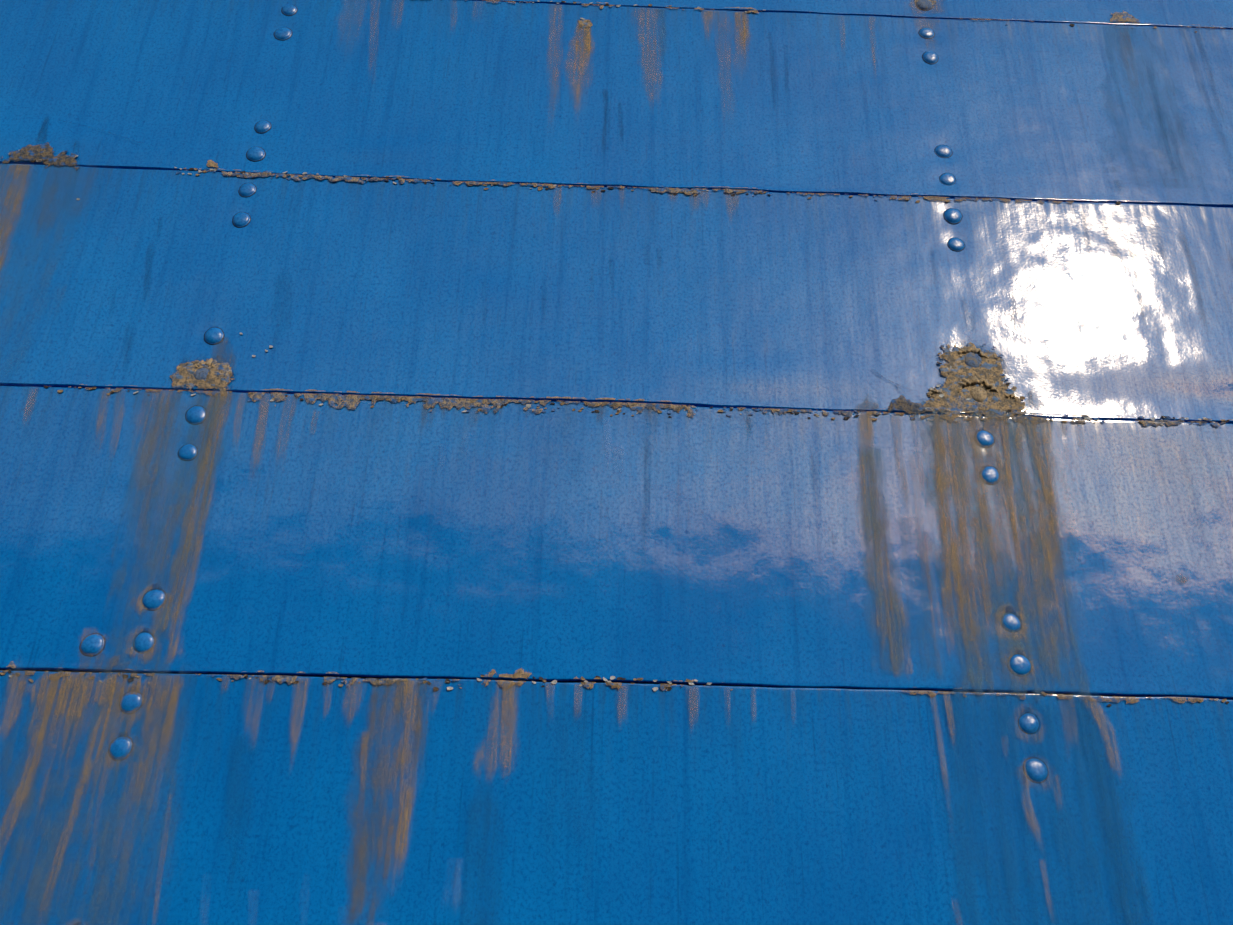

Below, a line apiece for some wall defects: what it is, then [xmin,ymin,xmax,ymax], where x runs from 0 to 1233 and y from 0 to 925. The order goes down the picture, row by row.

corrosion [574,18,592,94]
corrosion [140,393,228,655]
corrosion [927,415,1076,693]
corrosion [352,780,412,912]